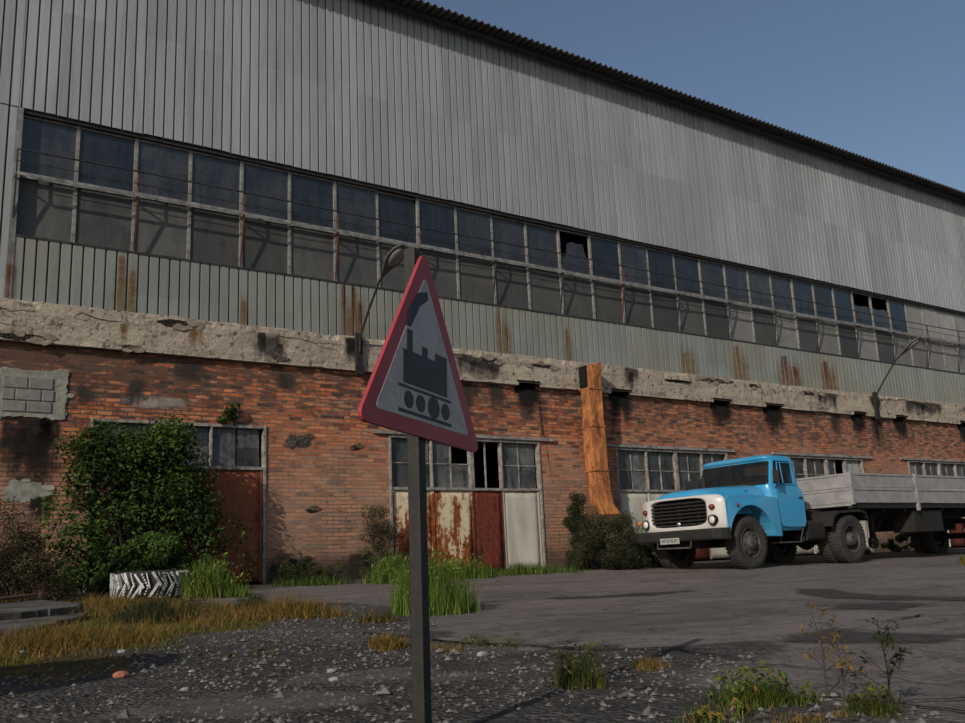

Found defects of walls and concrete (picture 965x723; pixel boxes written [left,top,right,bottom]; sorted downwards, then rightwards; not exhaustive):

water stain [258,332,283,356]
water stain [1,417,60,459]
spalling [285,434,315,448]
peeling [2,479,55,501]